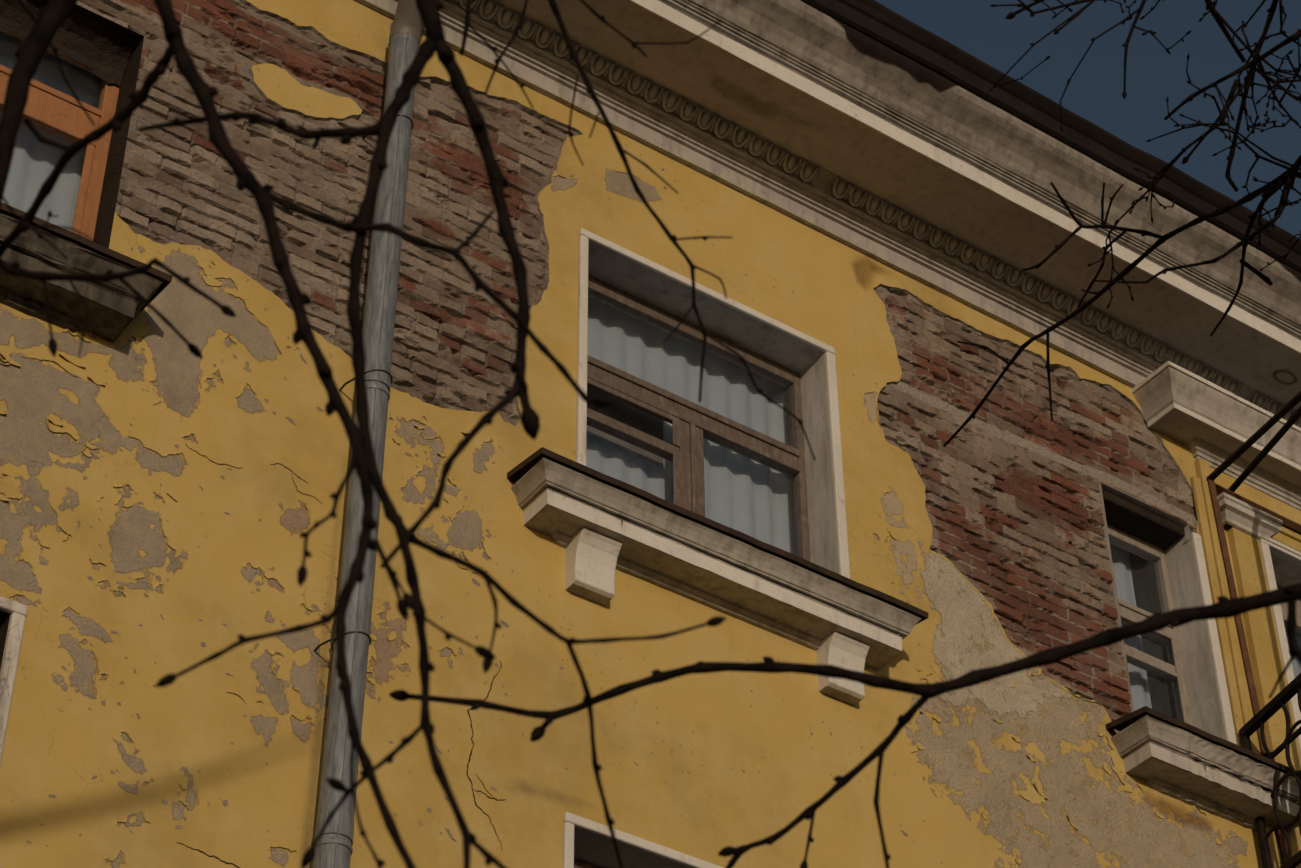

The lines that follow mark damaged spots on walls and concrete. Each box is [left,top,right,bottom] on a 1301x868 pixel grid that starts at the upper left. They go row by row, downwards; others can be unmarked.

flaking render [0,0,388,607]
flaking render [387,76,583,595]
peeling [53,605,120,710]
peeling [92,730,154,794]
peeling [162,767,200,829]
peeling [243,602,332,765]
peeling [365,601,410,702]
flaking render [863,284,1248,868]